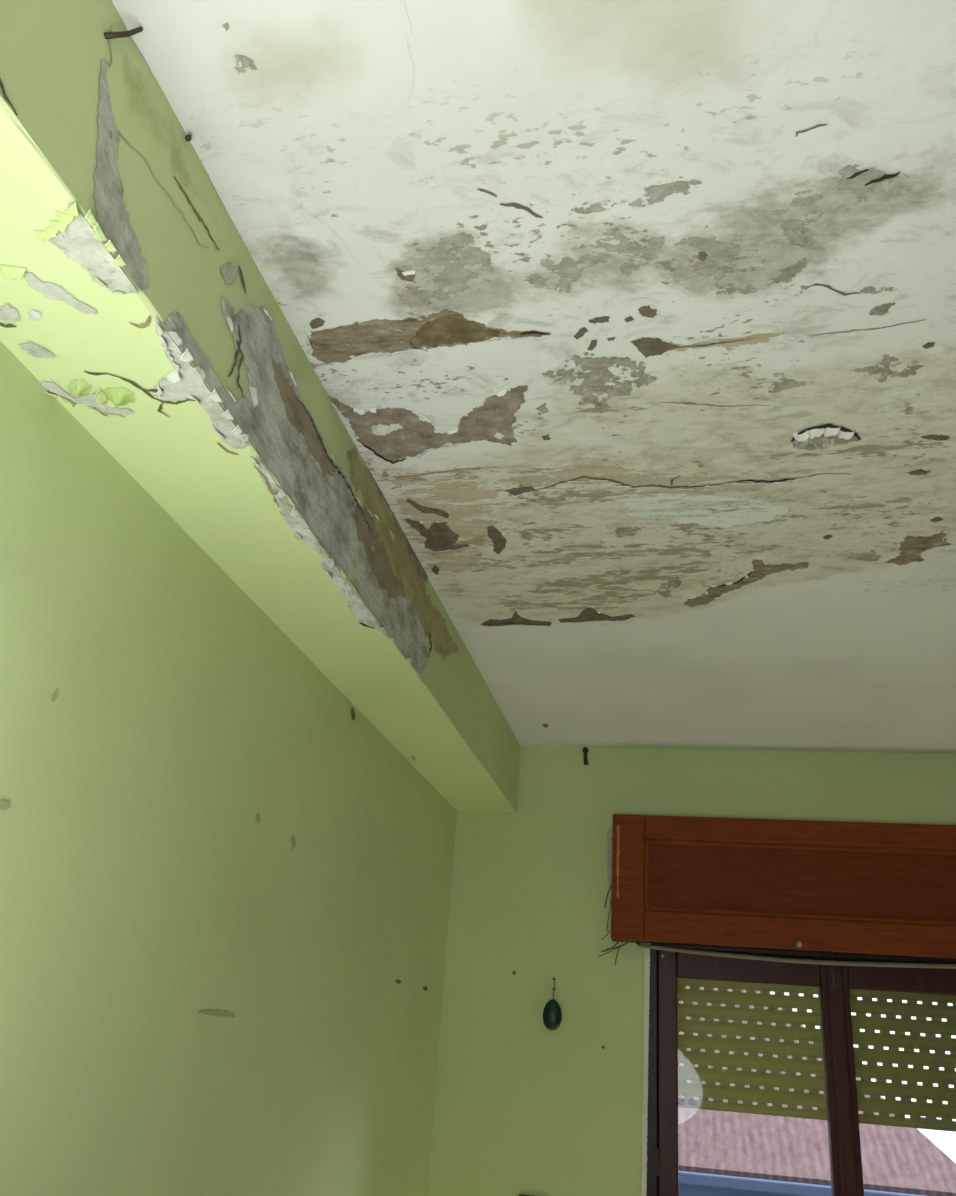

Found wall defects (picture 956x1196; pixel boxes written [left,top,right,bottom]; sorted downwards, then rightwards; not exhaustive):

crack [0,78,18,116]
peeling [34,58,150,295]
water stain [106,24,227,248]
water stain [242,107,956,332]
peeling [304,268,552,366]
peeling [542,303,678,413]
peeling [154,261,472,673]
peeling [329,385,549,464]
crack [526,473,852,492]
peeling [481,607,636,626]
peeling [654,559,810,608]
peeling [847,517,954,565]